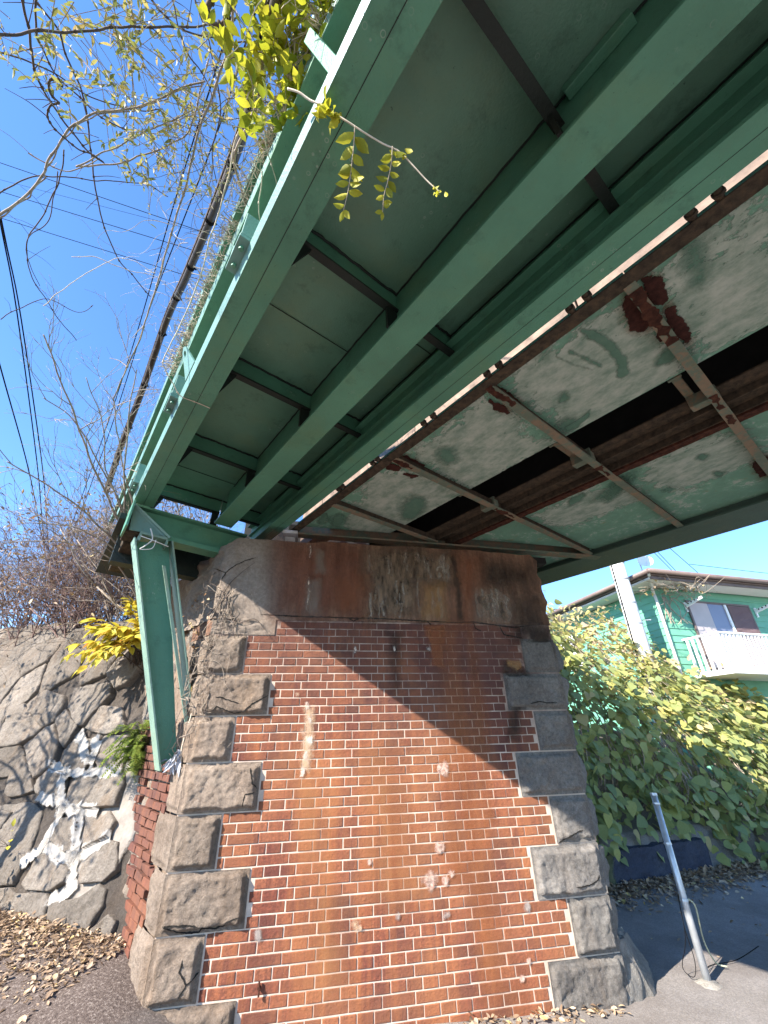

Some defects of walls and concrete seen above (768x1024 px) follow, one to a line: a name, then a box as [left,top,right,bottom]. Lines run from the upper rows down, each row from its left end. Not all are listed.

corrosion [622,276,692,347]
corrosion [485,385,521,414]
peeling [317,299,682,533]
corrosion [386,455,425,479]
peeling [530,428,768,529]
corrosion [752,457,768,478]
crack [213,695,268,714]
crack [242,768,257,807]
spalling [421,871,454,891]
crack [162,918,238,934]
crack [177,960,199,999]